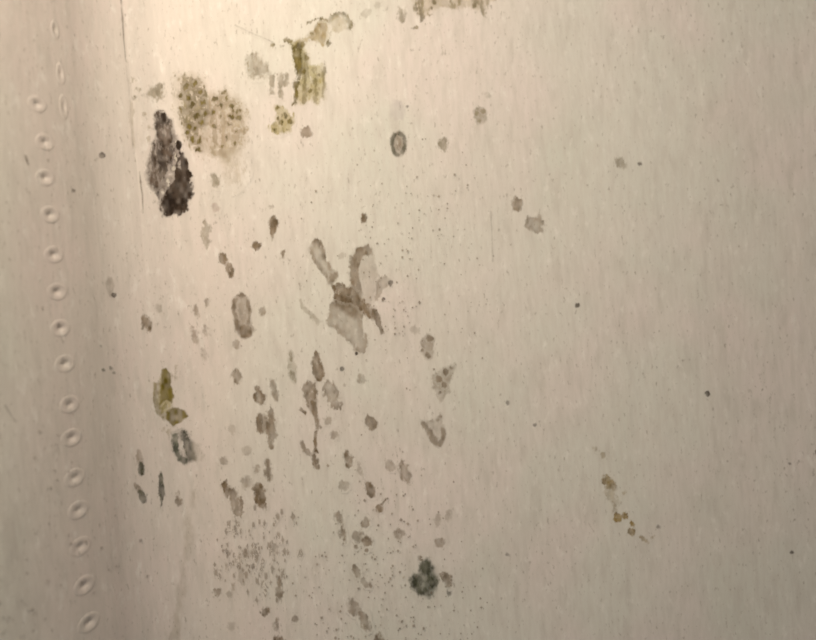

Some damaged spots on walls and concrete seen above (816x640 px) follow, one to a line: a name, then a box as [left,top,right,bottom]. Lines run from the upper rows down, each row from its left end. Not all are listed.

water stain [242,0,384,140]
water stain [126,66,255,220]
water stain [198,201,236,281]
water stain [249,213,281,253]
water stain [138,301,166,333]
water stain [229,290,268,352]
water stain [296,198,460,451]
water stain [150,346,464,640]